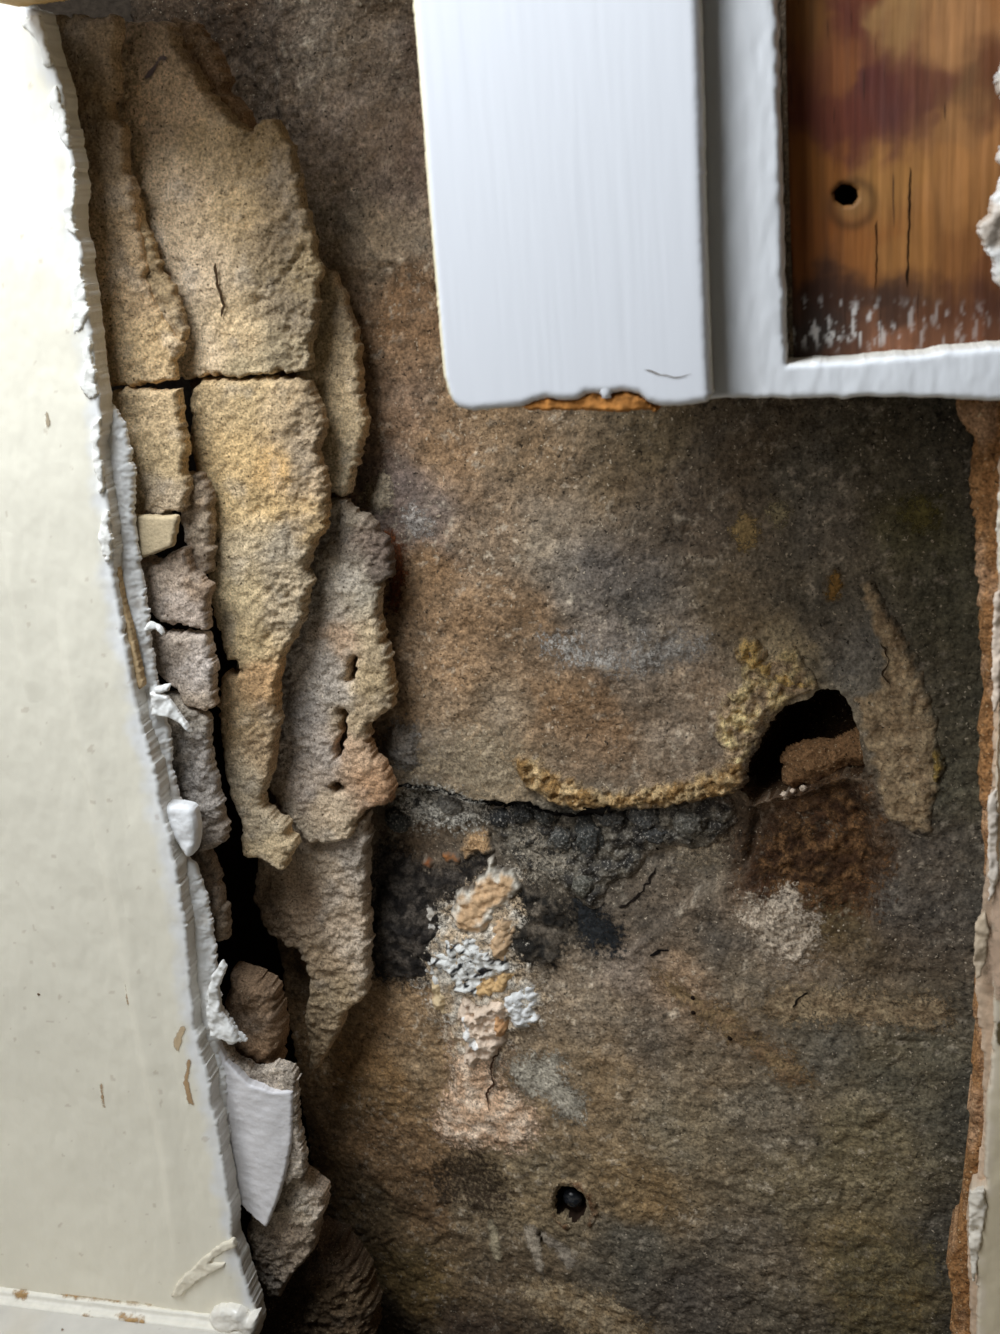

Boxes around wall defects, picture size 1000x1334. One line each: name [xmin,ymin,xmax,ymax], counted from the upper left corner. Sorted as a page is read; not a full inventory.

peeling [71,264,99,399]
peeling [150,683,193,733]
damp [370,635,818,990]
damp [537,621,713,679]
spalling [741,689,865,805]
peeling [991,590,1000,712]
crack [992,721,1000,864]
peeling [973,789,999,979]
damp [645,880,958,1090]
peeling [206,959,309,1226]
damp [502,1048,591,1131]
damp [516,1271,661,1334]